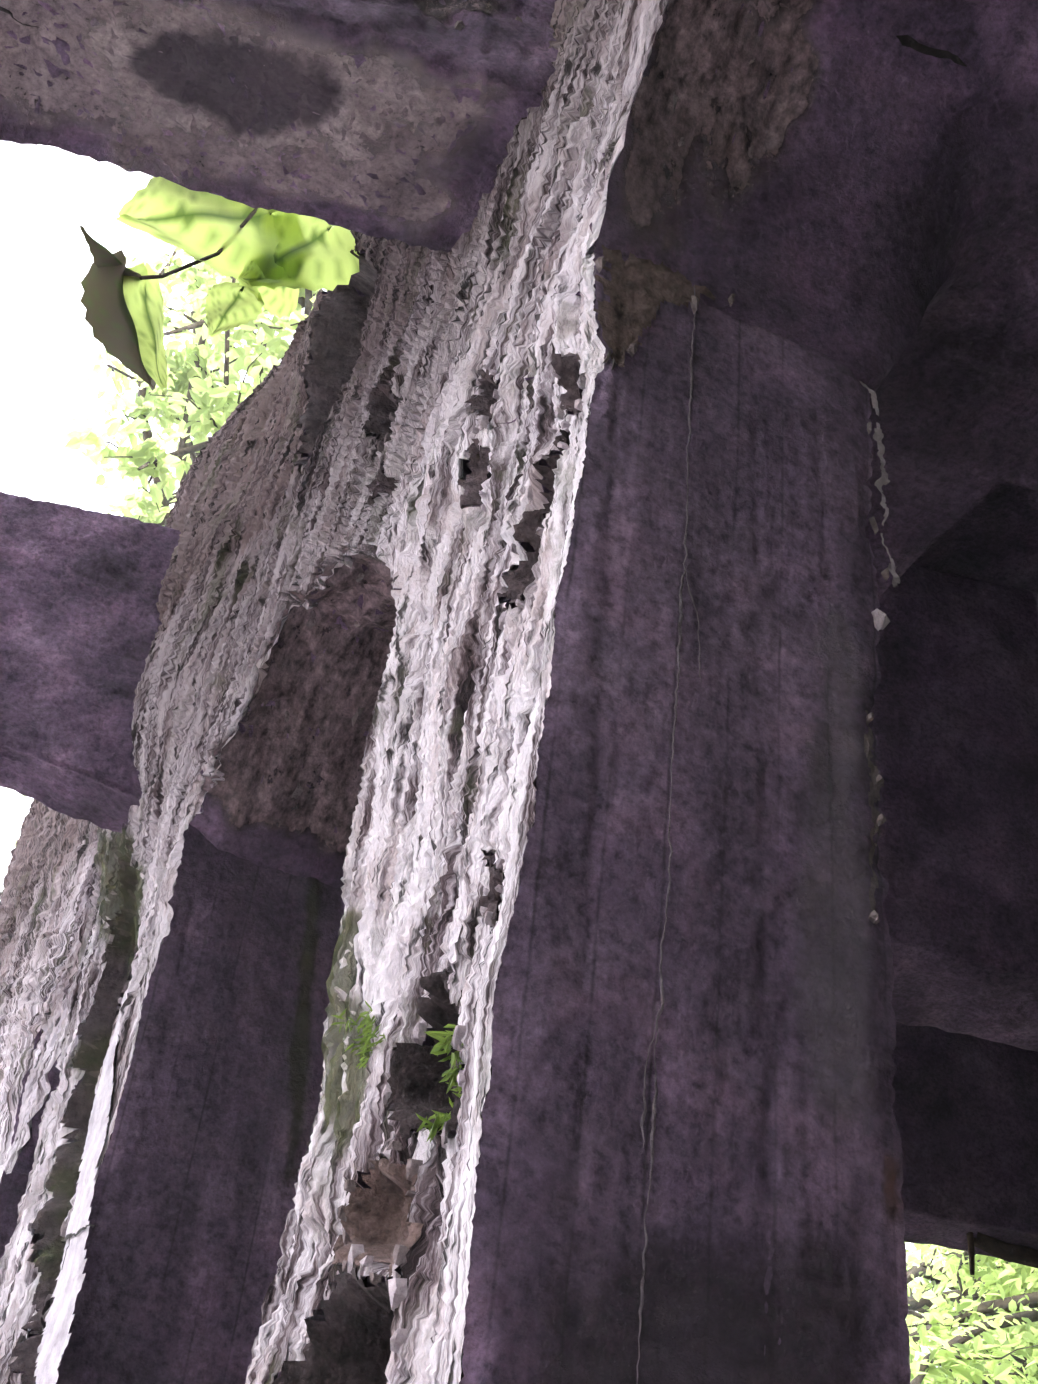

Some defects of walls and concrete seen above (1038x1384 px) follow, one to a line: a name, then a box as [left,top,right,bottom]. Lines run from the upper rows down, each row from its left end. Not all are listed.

crack [0,6,40,28]
damp [0,0,499,227]
peeling [413,1022,427,1046]
peeling [451,1006,466,1052]
peeling [441,1105,461,1149]
spalling [272,1050,430,1384]